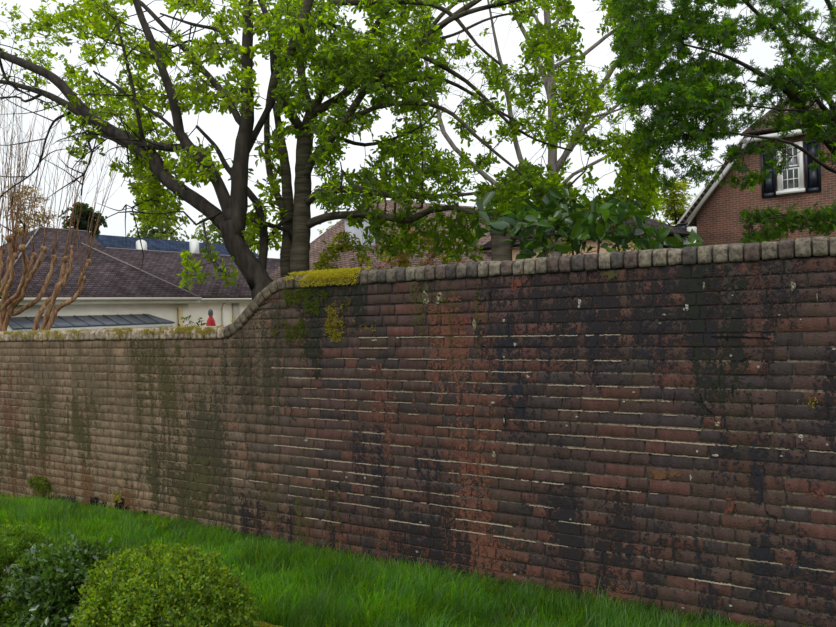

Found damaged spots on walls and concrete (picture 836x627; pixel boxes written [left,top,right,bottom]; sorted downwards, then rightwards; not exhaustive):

leakage [0,259,836,627]